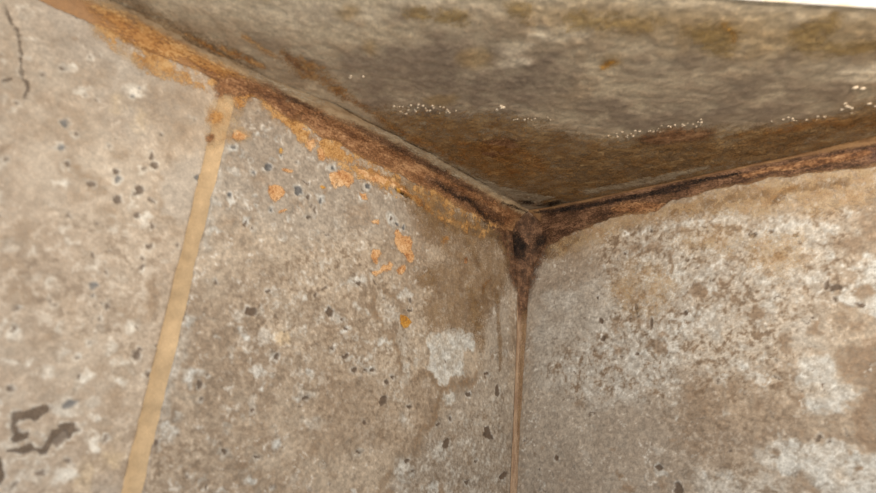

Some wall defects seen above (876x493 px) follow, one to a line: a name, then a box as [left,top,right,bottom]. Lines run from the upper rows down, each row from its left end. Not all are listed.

damp [404,6,467,26]
crack [3,11,29,97]
corrosion [86,1,876,320]
damp [519,172,741,213]
damp [512,227,547,260]